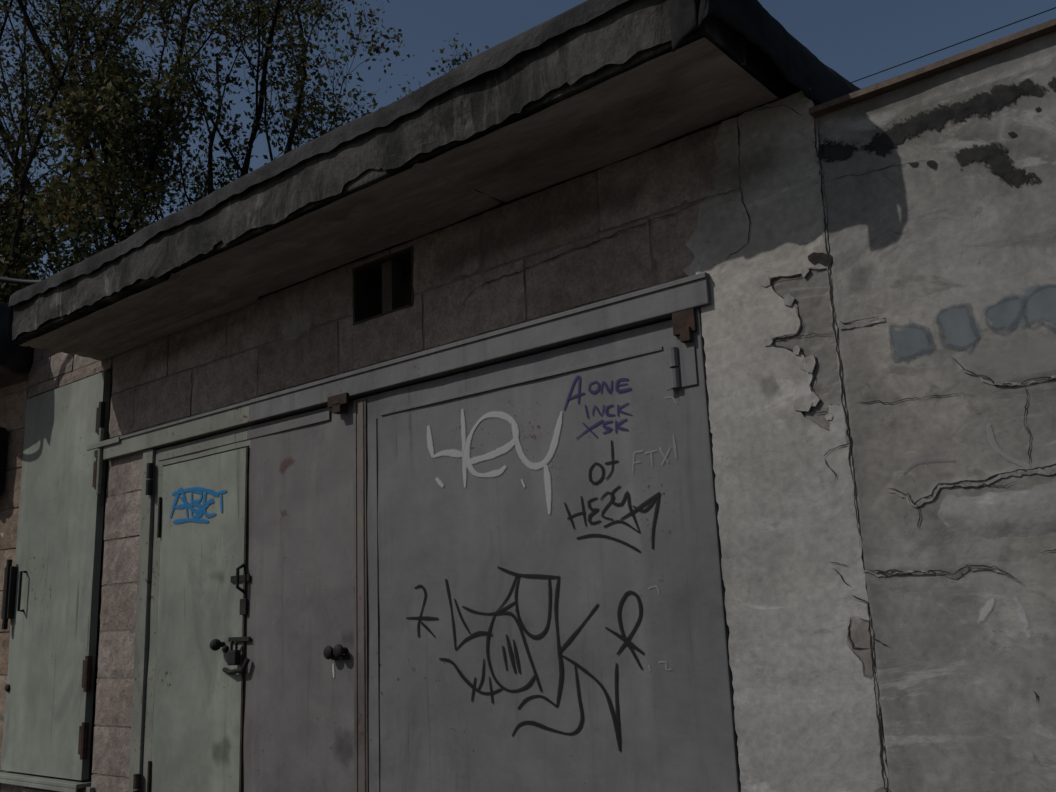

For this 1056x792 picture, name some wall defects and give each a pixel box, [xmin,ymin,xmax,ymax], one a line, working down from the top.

spalling [761,252,886,430]
crack [457,105,1056,792]
spalling [847,616,875,678]